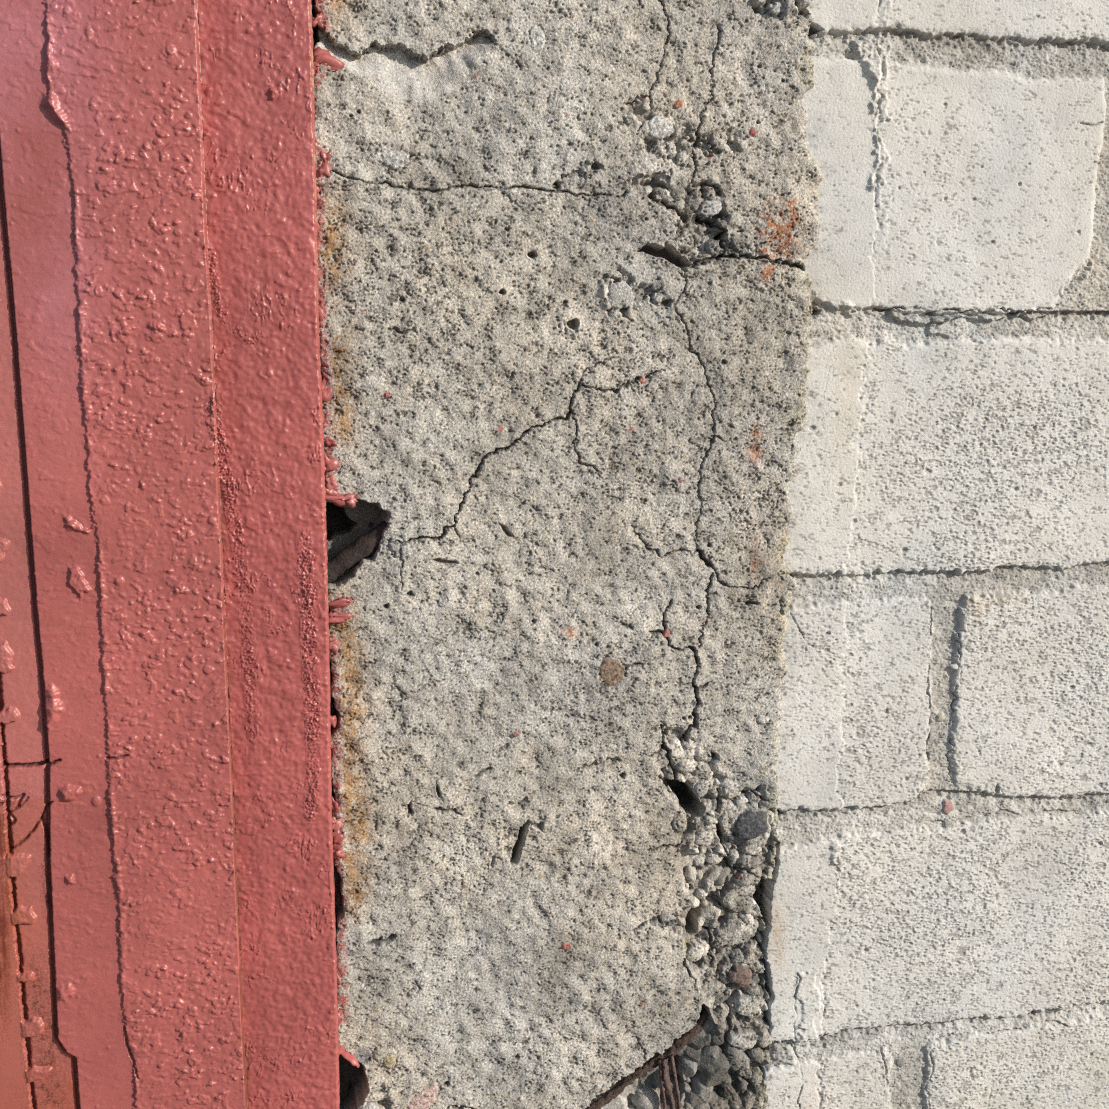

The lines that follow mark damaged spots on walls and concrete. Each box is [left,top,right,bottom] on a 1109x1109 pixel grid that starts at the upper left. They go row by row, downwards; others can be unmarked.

crack [623,0,672,111]
rust [748,183,815,287]
crack [330,24,805,781]
spalling [327,521,387,584]
crack [789,611,821,662]
crack [433,806,464,817]
spalling [583,757,619,773]
crack [727,790,775,803]
rust [0,779,74,1109]
spalling [670,844,736,947]
spalling [585,1004,731,1109]